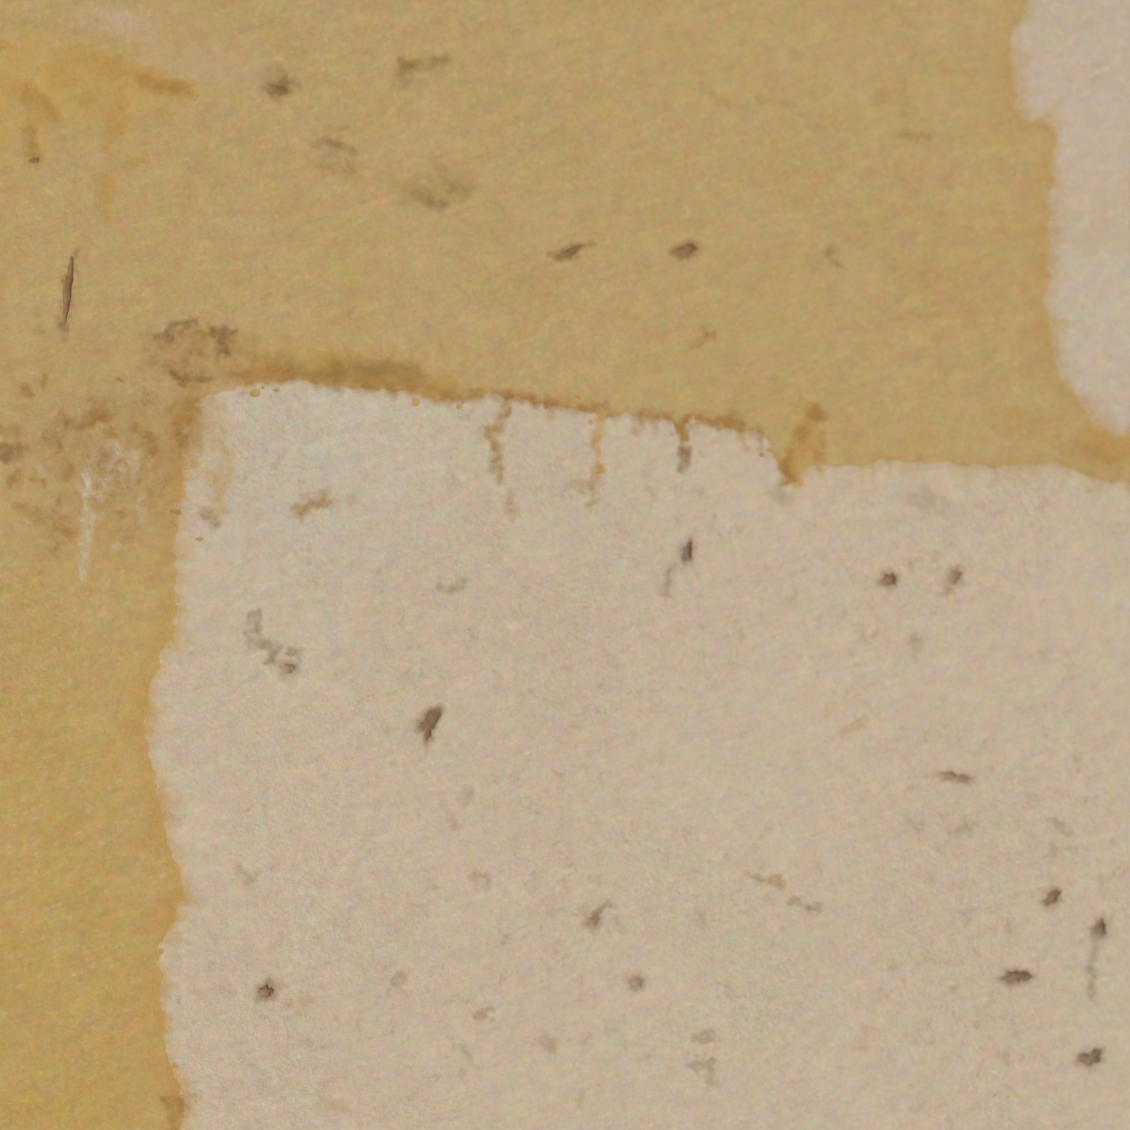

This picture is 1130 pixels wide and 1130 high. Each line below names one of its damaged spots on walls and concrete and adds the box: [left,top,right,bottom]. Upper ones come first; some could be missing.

leakage [244,350,455,395]
peeling [1009,0,1130,438]
peeling [138,375,1130,1130]